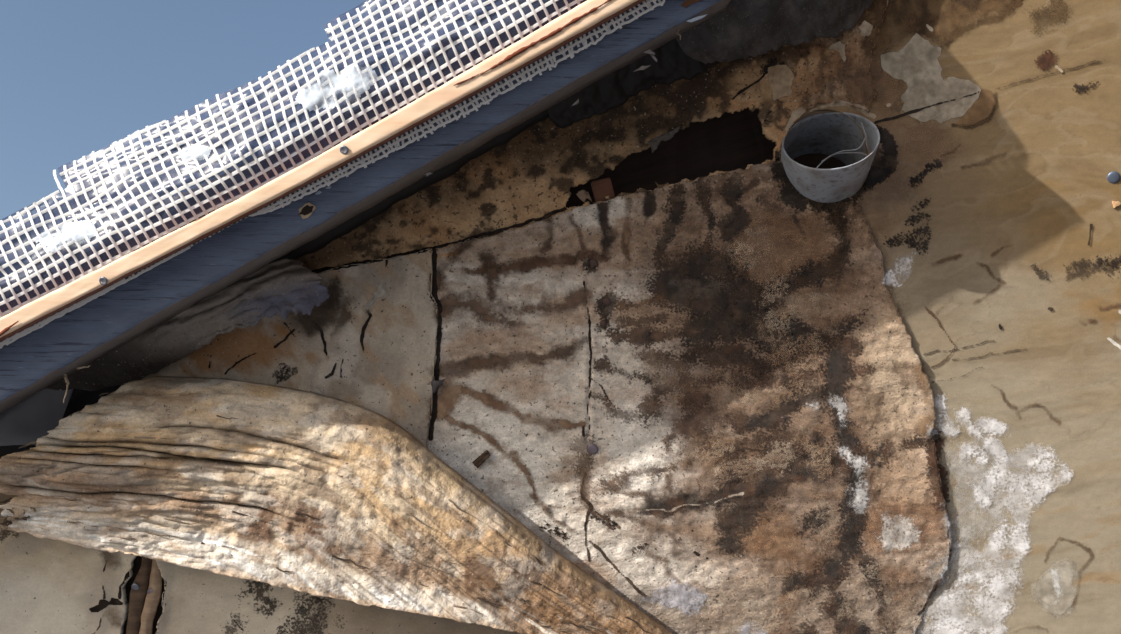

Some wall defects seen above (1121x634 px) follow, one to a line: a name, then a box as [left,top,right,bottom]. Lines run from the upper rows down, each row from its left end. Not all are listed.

peeling [768,65,794,101]
peeling [785,100,877,135]
peeling [858,21,873,37]
peeling [881,24,997,129]
crack [208,296,375,379]
crack [311,207,567,441]
water stain [427,338,590,531]
water stain [429,201,631,328]
crack [582,281,610,437]
water stain [585,125,1072,634]
crack [539,477,647,598]
water stain [220,580,347,634]